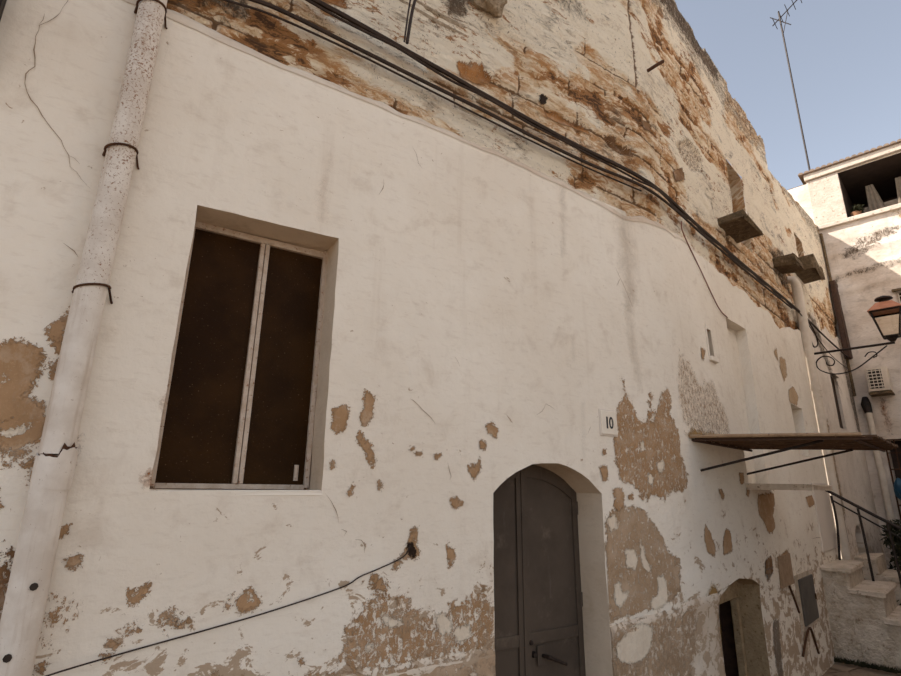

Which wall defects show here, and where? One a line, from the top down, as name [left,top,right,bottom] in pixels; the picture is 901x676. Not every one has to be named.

crack [25,1,87,185]
spalling [539,94,591,136]
peeling [0,306,70,486]
peeling [331,389,378,469]
peeling [467,423,498,482]
peeling [599,350,728,676]
peeling [739,472,775,534]
peeling [98,619,142,664]
peeling [126,582,152,607]
peeling [156,605,193,636]
peeling [222,586,263,613]
peeling [298,525,495,676]